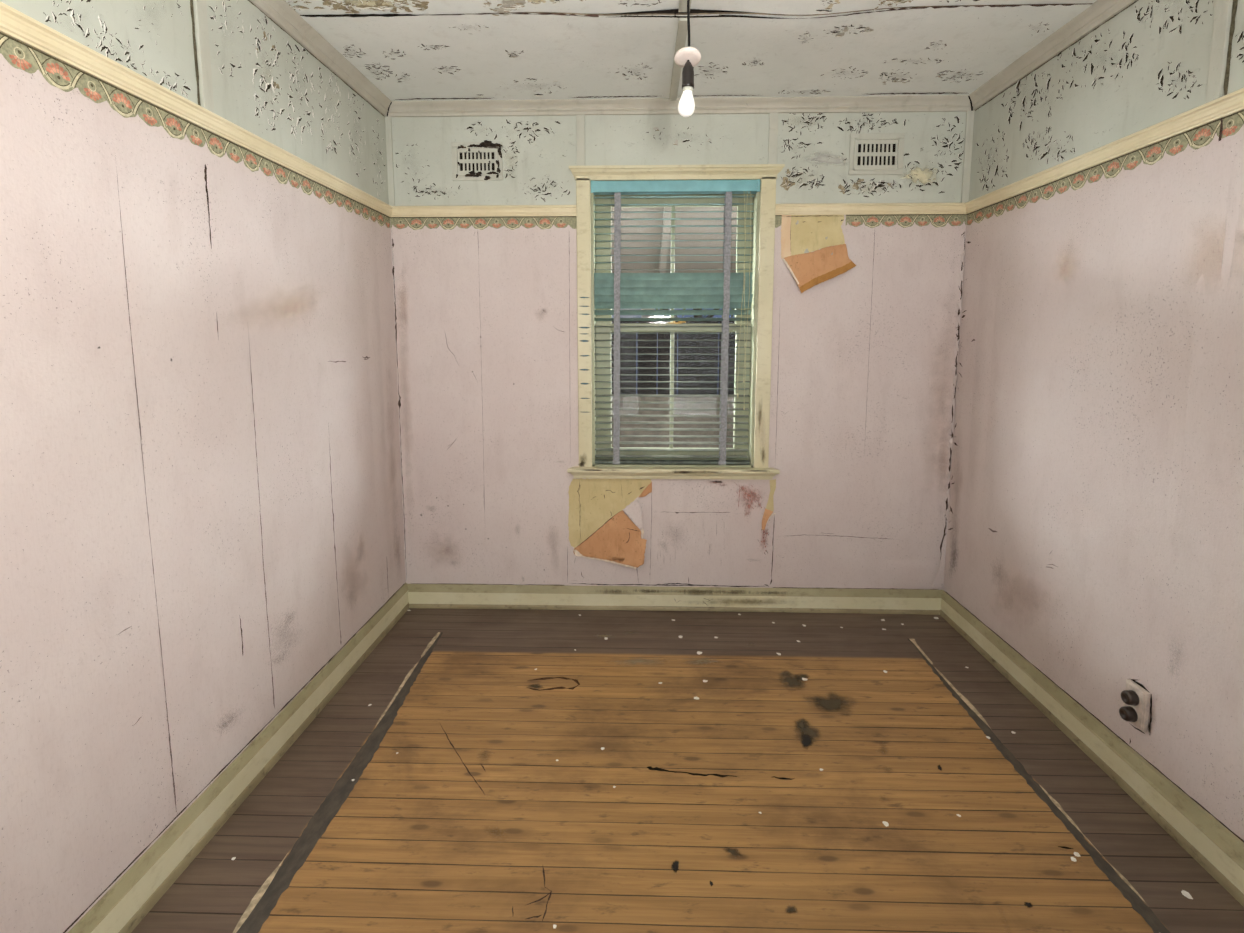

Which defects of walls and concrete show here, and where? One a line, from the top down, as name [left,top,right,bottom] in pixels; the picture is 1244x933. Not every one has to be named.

peeling [209,0,570,201]